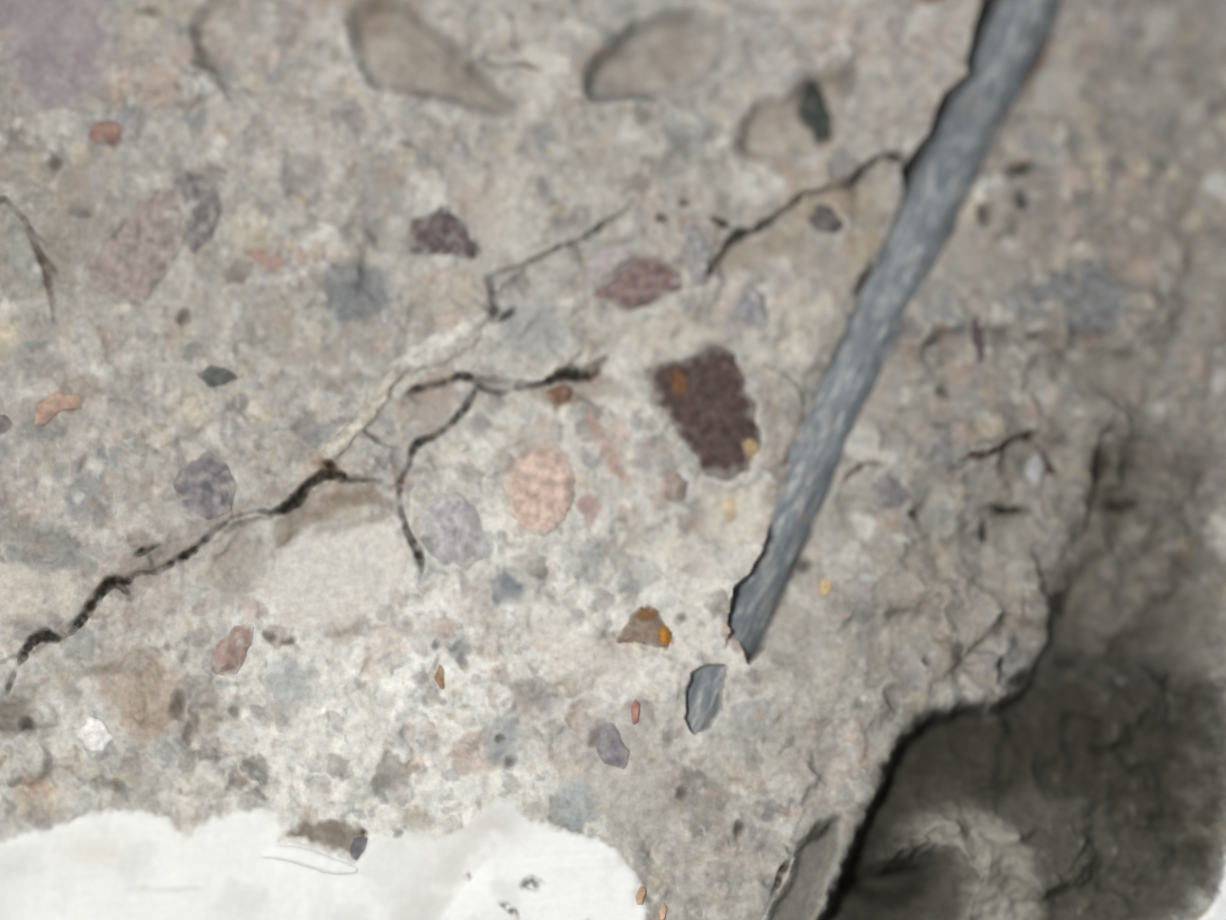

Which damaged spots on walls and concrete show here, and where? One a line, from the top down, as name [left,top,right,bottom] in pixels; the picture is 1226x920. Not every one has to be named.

spalling [321,367,405,460]
spalling [390,319,484,376]
crack [541,369,597,385]
crack [23,577,131,655]
crack [140,540,207,565]
crack [262,462,347,515]
spalling [265,513,410,634]
crack [398,373,484,564]
spalling [419,491,489,571]
spalling [503,443,576,537]
spalling [818,602,1226,920]
leakage [909,676,1222,870]